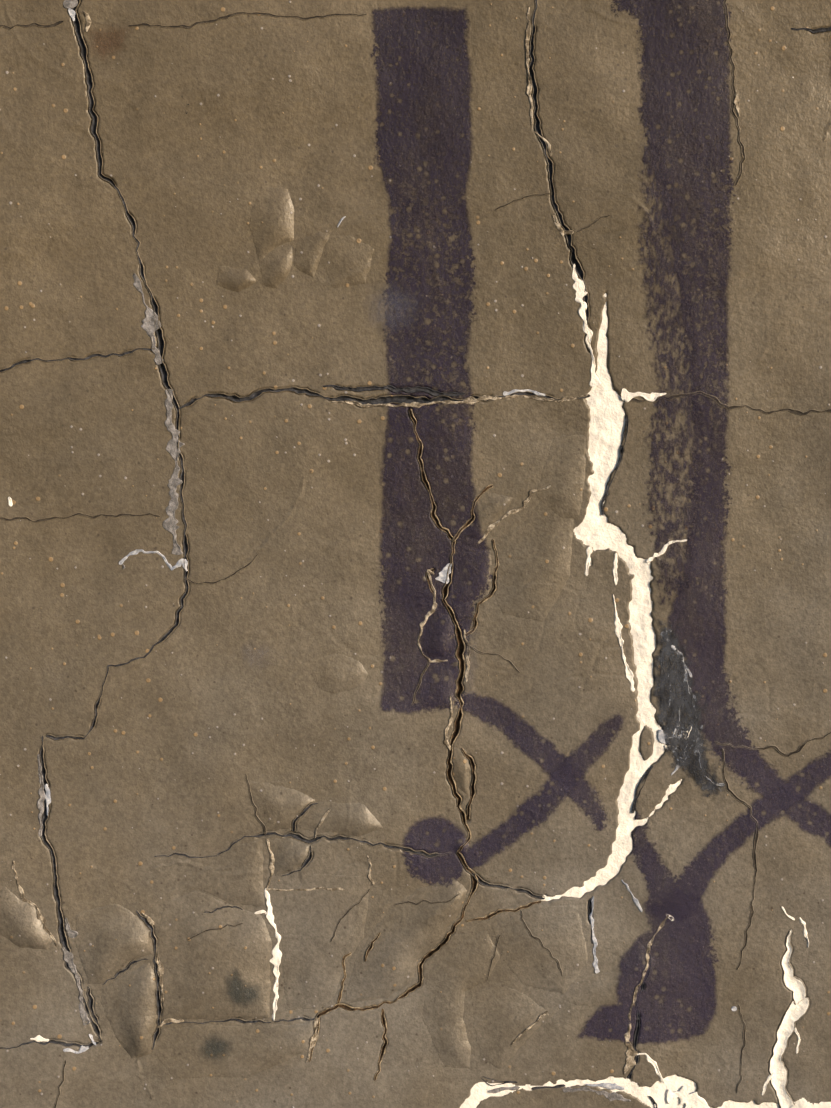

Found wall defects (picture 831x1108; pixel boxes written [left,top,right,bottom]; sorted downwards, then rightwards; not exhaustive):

crack [723,0,746,186]
crack [791,26,831,34]
crack [621,388,831,416]
crack [0,0,610,1108]
flaking render [542,293,692,901]
crack [714,731,831,970]
flaking render [460,1075,779,1108]
crack [621,880,674,1083]
crack [736,907,810,1108]
flaking render [792,1098,831,1108]